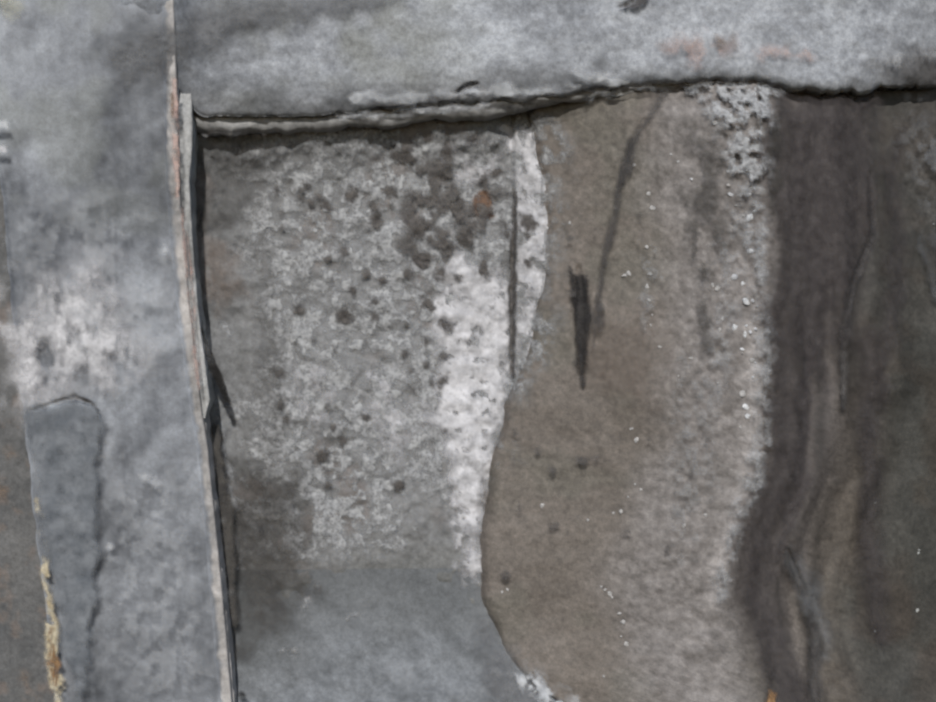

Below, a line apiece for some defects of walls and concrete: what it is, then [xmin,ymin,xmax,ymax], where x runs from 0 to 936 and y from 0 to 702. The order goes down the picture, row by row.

leakage [686,75,876,702]
rust [41,558,64,702]
leakage [488,651,562,702]